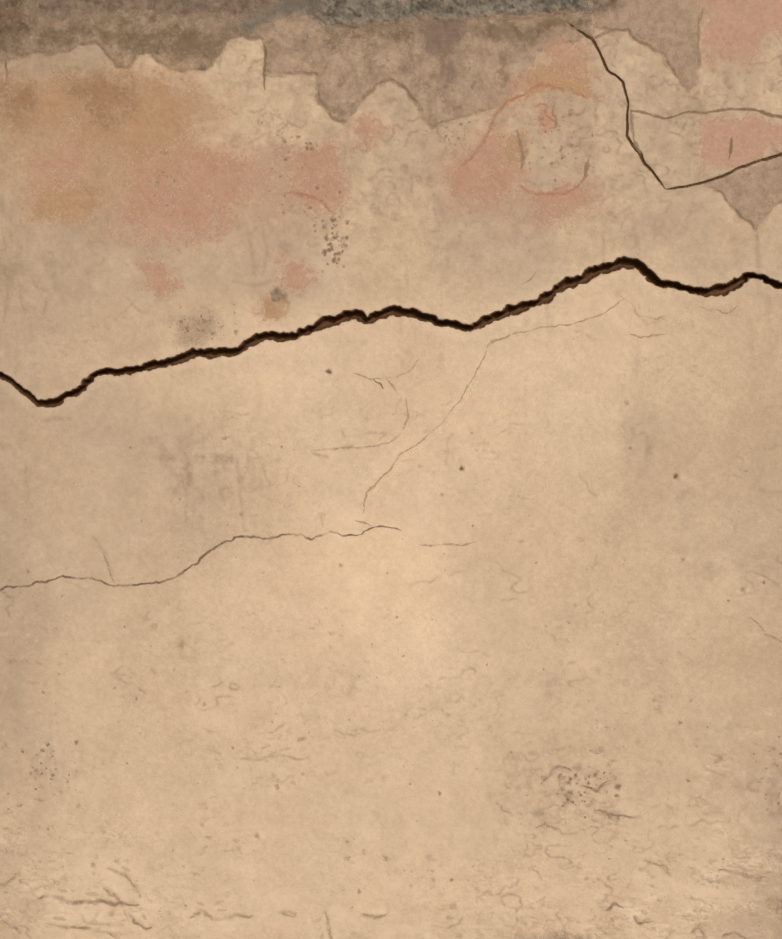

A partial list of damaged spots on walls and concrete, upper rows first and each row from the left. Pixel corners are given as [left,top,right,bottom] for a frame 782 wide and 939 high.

peeling [0,0,703,169]
crack [568,23,782,189]
peeling [706,157,782,230]
crack [0,256,782,411]
crack [334,373,425,536]
crack [0,534,321,591]